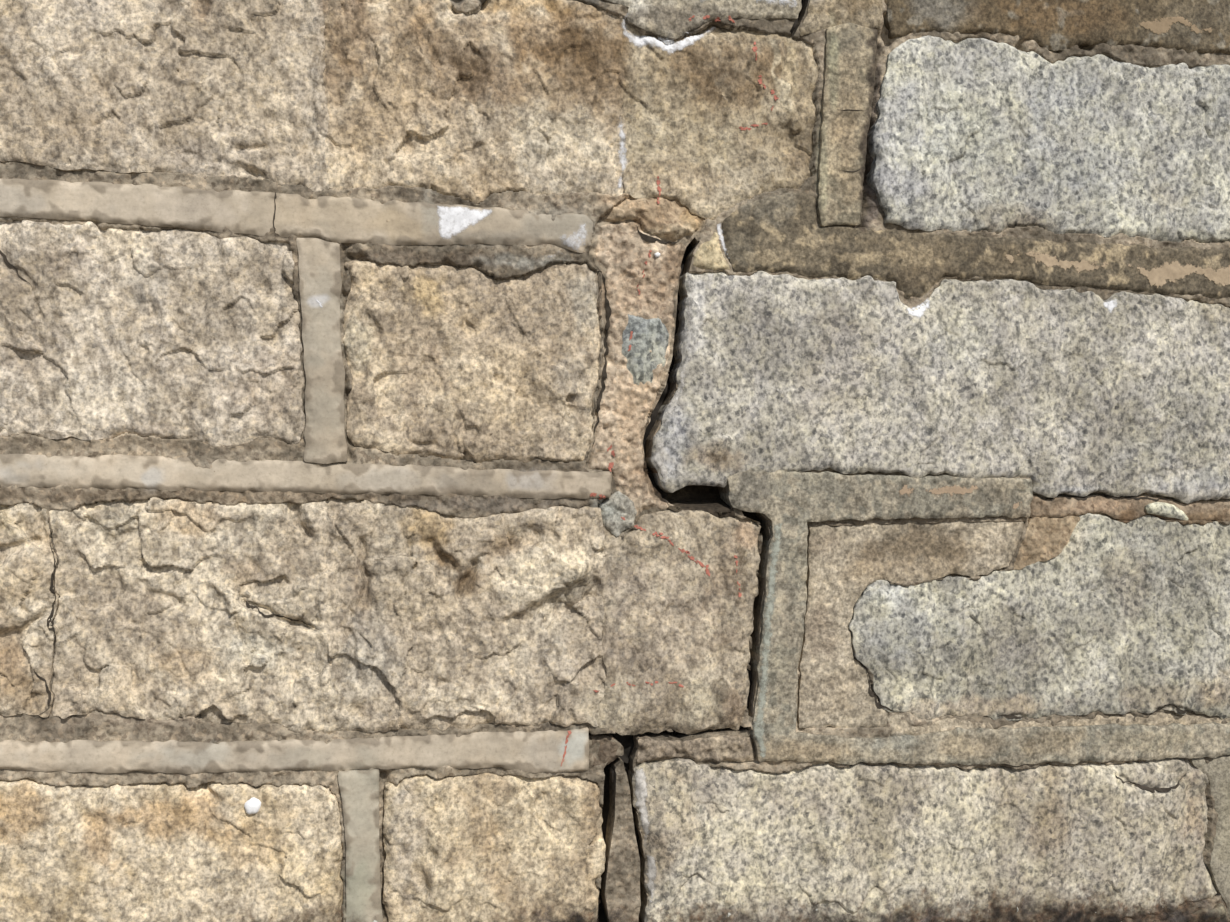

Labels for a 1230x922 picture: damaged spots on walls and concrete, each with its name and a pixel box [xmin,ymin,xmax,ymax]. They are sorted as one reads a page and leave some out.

crack [637,227,760,522]
crack [34,542,56,716]
crack [726,635,752,729]
crack [601,729,680,851]
water stain [532,908,630,922]
crack [597,889,607,922]
water stain [680,905,770,922]
water stain [791,891,1230,922]